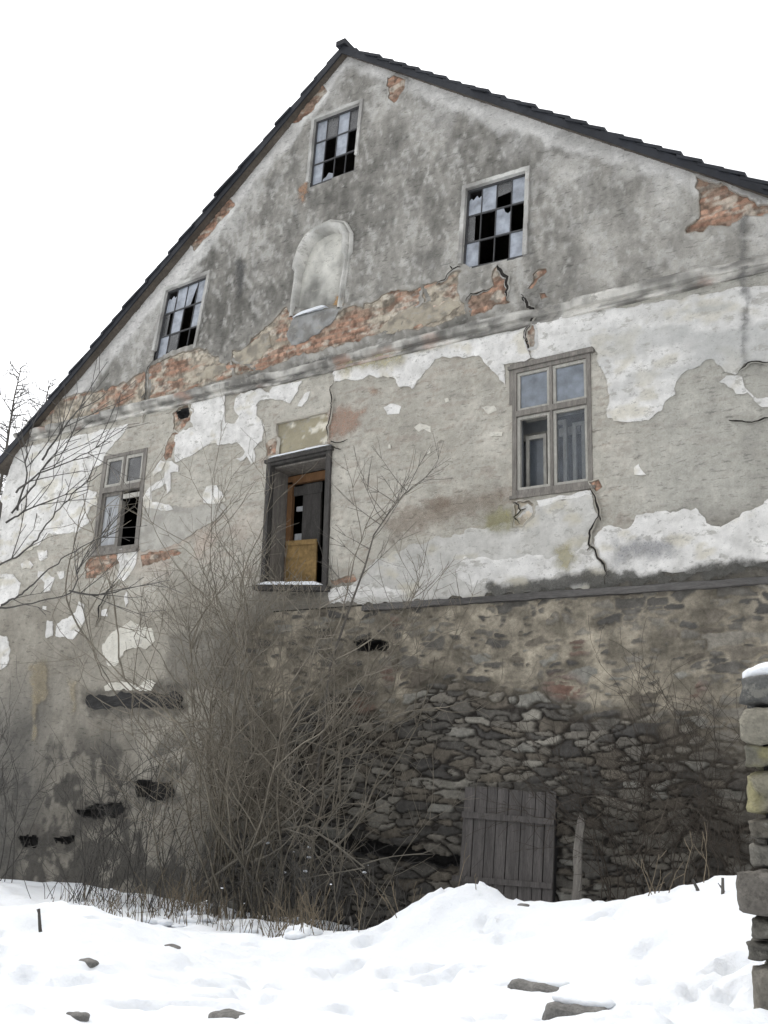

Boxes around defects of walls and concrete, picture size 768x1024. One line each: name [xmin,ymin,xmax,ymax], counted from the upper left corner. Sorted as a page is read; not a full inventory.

flaking render [385,73,409,106]
flaking render [190,197,240,256]
flaking render [679,173,768,241]
crack [465,265,536,357]
crack [738,361,768,372]
flaking render [0,263,768,607]
crack [729,416,768,424]
crack [587,486,607,584]
flaking render [0,635,11,670]
flaking render [42,602,85,640]
flaking render [102,620,155,666]